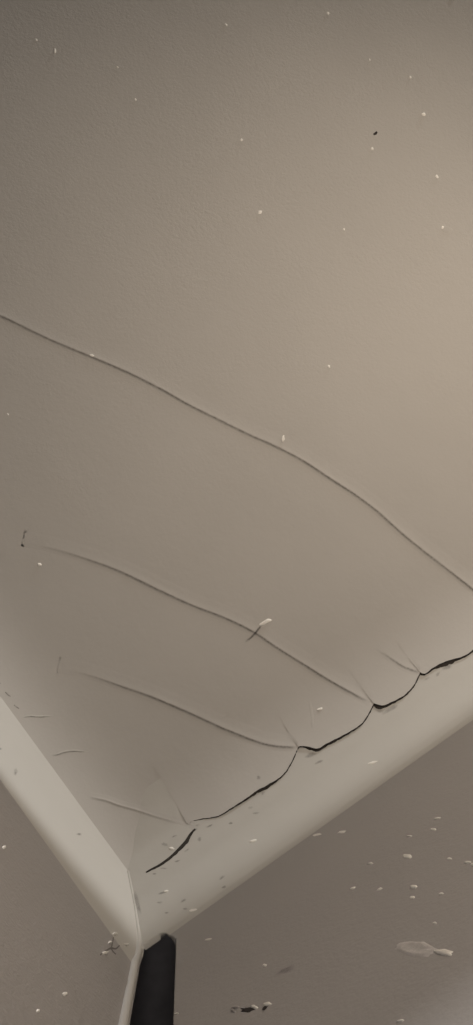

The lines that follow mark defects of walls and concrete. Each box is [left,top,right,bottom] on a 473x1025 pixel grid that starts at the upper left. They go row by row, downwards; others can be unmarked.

crack [0,302,473,873]